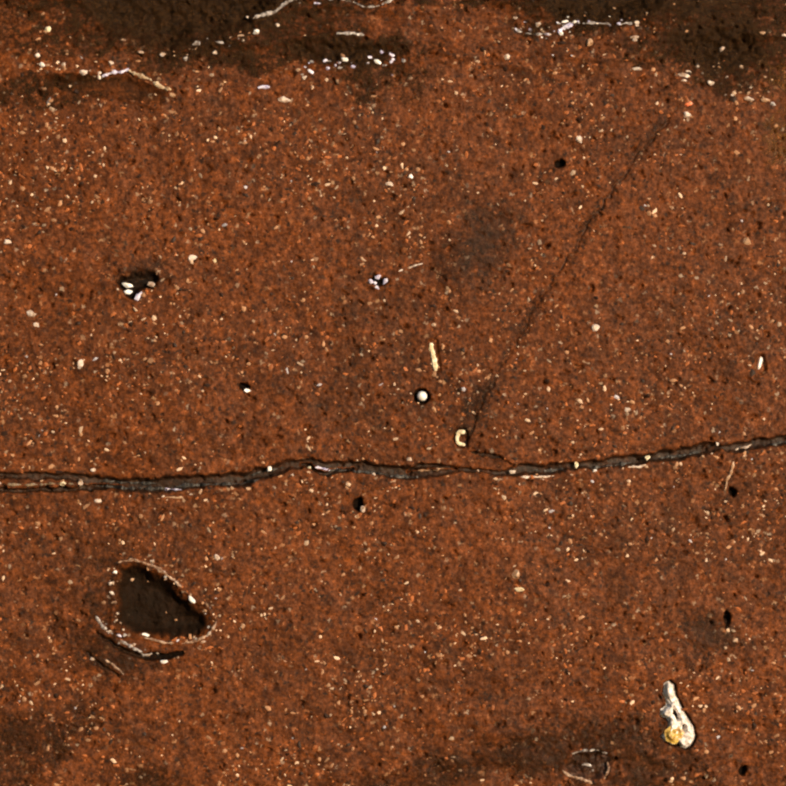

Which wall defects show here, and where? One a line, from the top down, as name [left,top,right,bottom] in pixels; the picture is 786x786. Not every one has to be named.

crack [0,105,786,503]
spalling [95,558,217,664]
spalling [86,653,124,677]